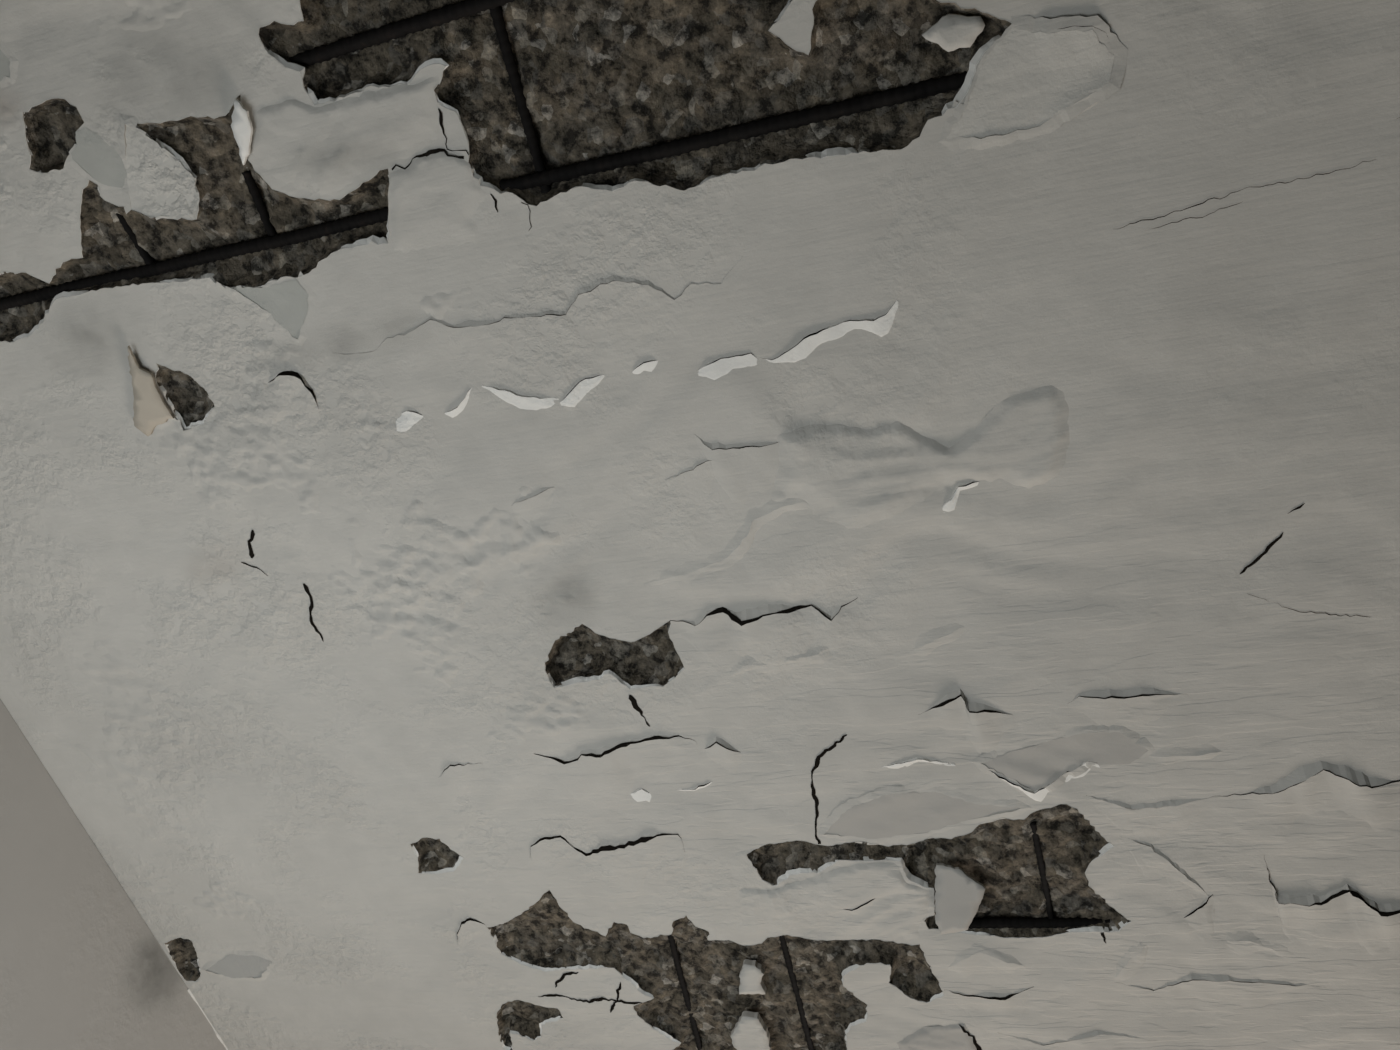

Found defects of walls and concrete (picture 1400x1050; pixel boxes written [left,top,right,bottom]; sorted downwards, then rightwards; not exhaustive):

spalling [258,0,1128,206]
spalling [0,94,390,346]
peeling [697,300,898,380]
spalling [127,345,215,436]
peeling [268,371,320,428]
peeling [445,374,604,418]
peeling [545,598,863,689]
peeling [534,735,743,802]
crack [811,734,847,844]
spalling [746,687,1400,955]
spalling [457,832,1160,1050]
peeling [1116,973,1328,1017]